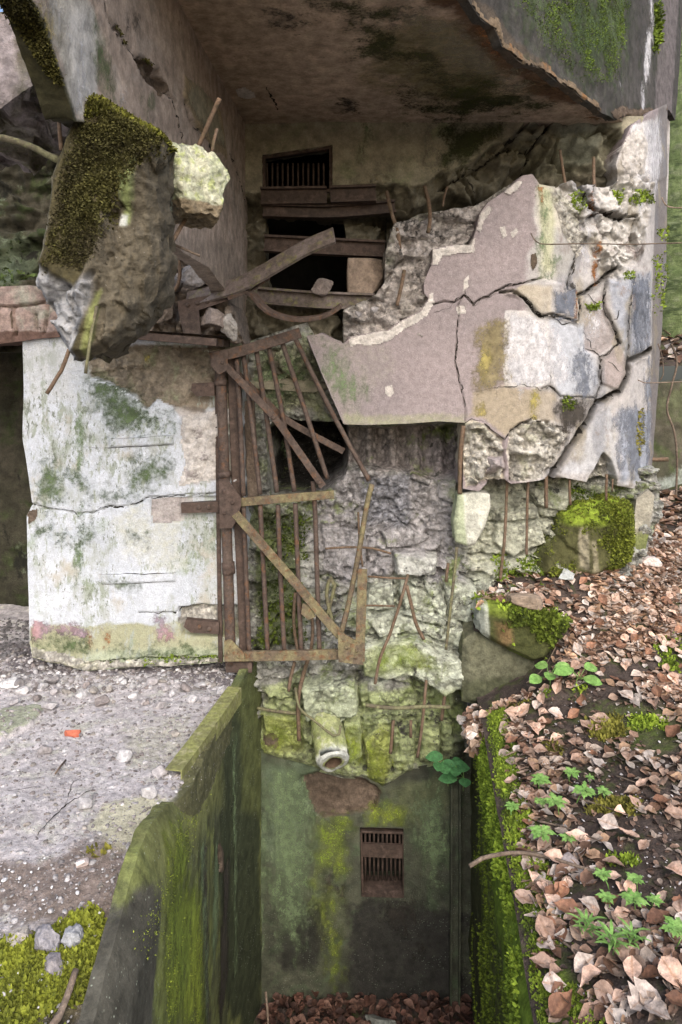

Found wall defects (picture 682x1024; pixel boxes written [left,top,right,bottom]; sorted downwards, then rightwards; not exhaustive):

spalling [472,1,653,119]
damp [642,0,662,110]
spalling [505,181,522,194]
spalling [430,206,491,265]
spalling [349,293,435,347]
crack [434,244,635,468]
spalling [90,346,237,523]
spalling [464,420,567,485]
spalling [589,455,611,478]
crack [34,492,216,516]
damp [143,617,199,663]
damp [202,795,238,1022]